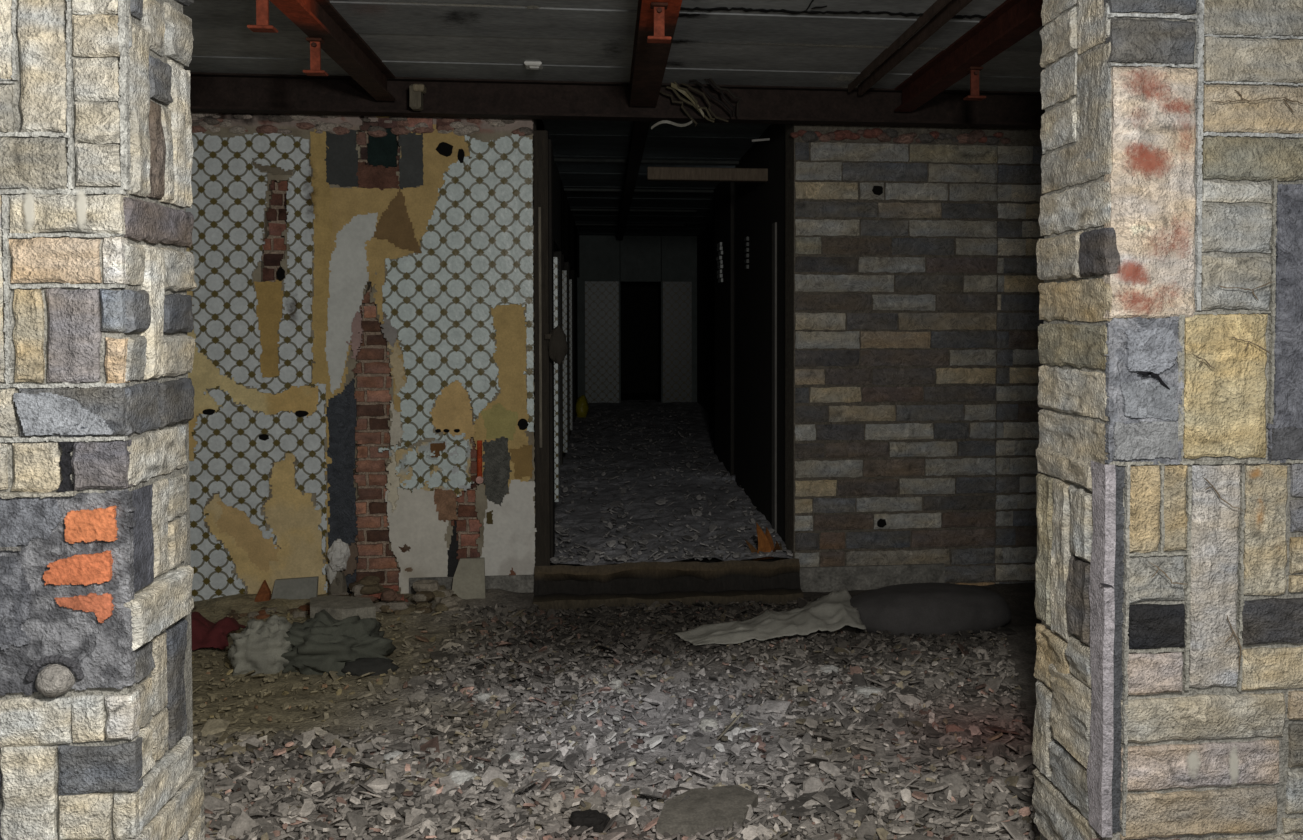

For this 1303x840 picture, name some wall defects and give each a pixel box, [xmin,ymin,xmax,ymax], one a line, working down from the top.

crack [680,0,987,19]
rust [1131,145,1164,172]
rust [1122,263,1146,281]
flaking render [187,113,537,595]
crack [1137,371,1170,390]